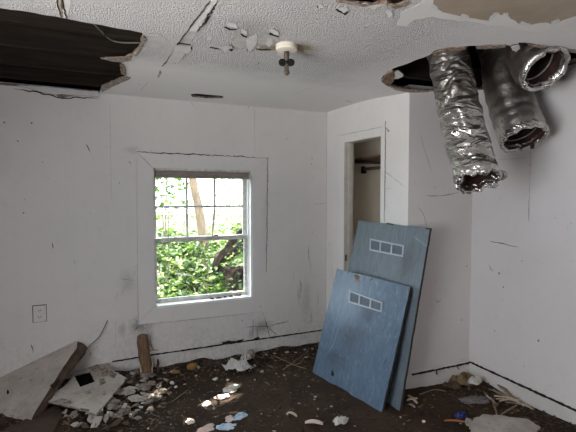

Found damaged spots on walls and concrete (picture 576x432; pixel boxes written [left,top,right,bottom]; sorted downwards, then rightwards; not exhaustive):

spalling [336,0,409,18]
peeling [431,0,576,28]
crack [141,1,217,90]
peeling [219,22,283,57]
spalling [476,43,520,52]
spalling [14,35,146,99]
spalling [381,70,430,93]
crack [146,106,268,272]
crack [112,306,322,362]